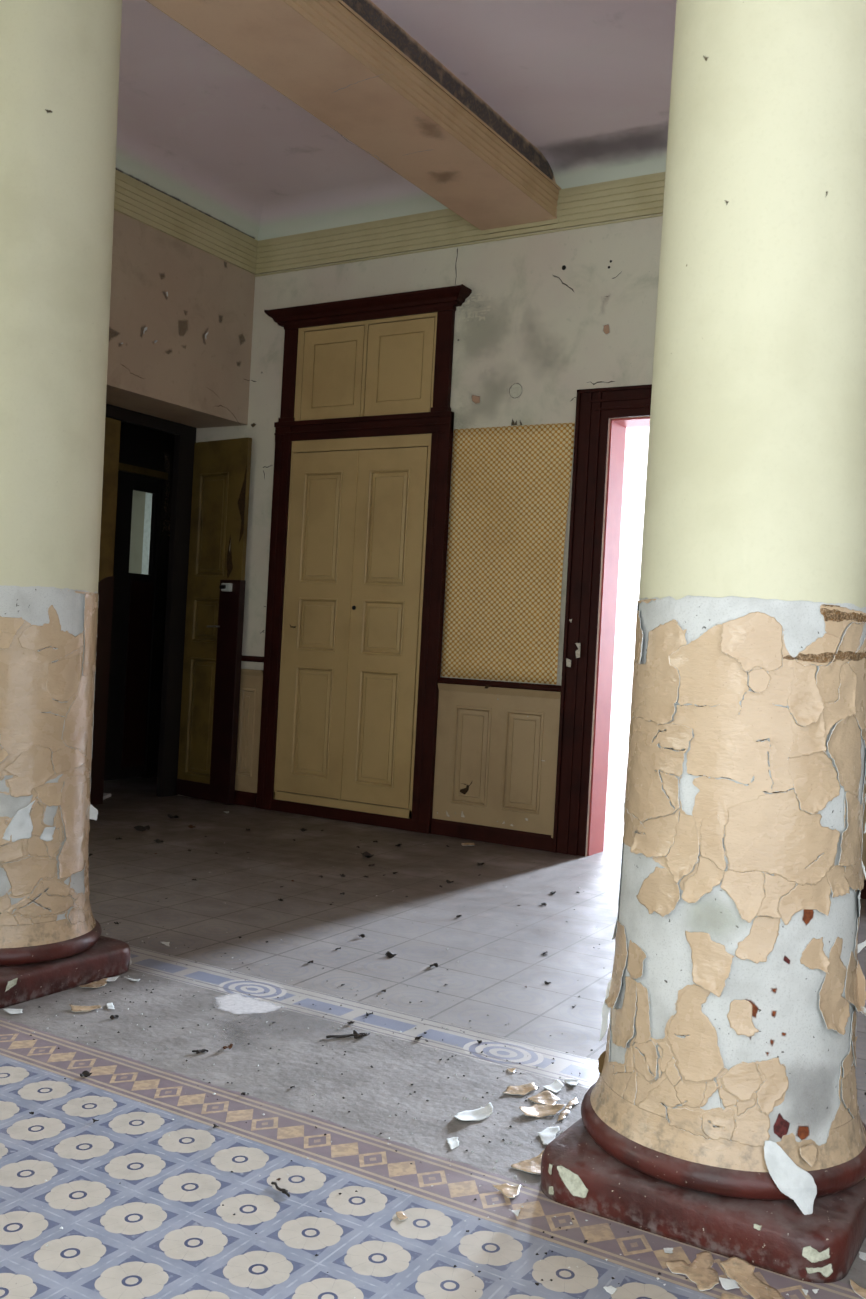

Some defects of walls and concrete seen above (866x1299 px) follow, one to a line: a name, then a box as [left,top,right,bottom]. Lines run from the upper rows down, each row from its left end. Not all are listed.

peeling [0,591,99,948]
peeling [492,599,866,1217]